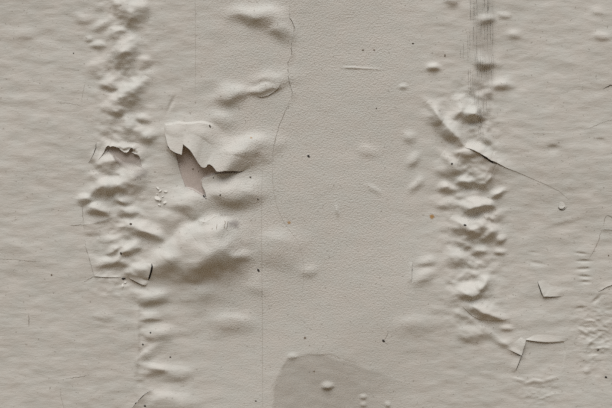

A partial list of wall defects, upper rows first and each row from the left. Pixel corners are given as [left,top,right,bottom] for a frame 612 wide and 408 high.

peeling [89,139,149,167]
peeling [164,123,254,206]
crack [465,142,572,199]
crack [85,238,160,286]
peeling [505,334,568,373]